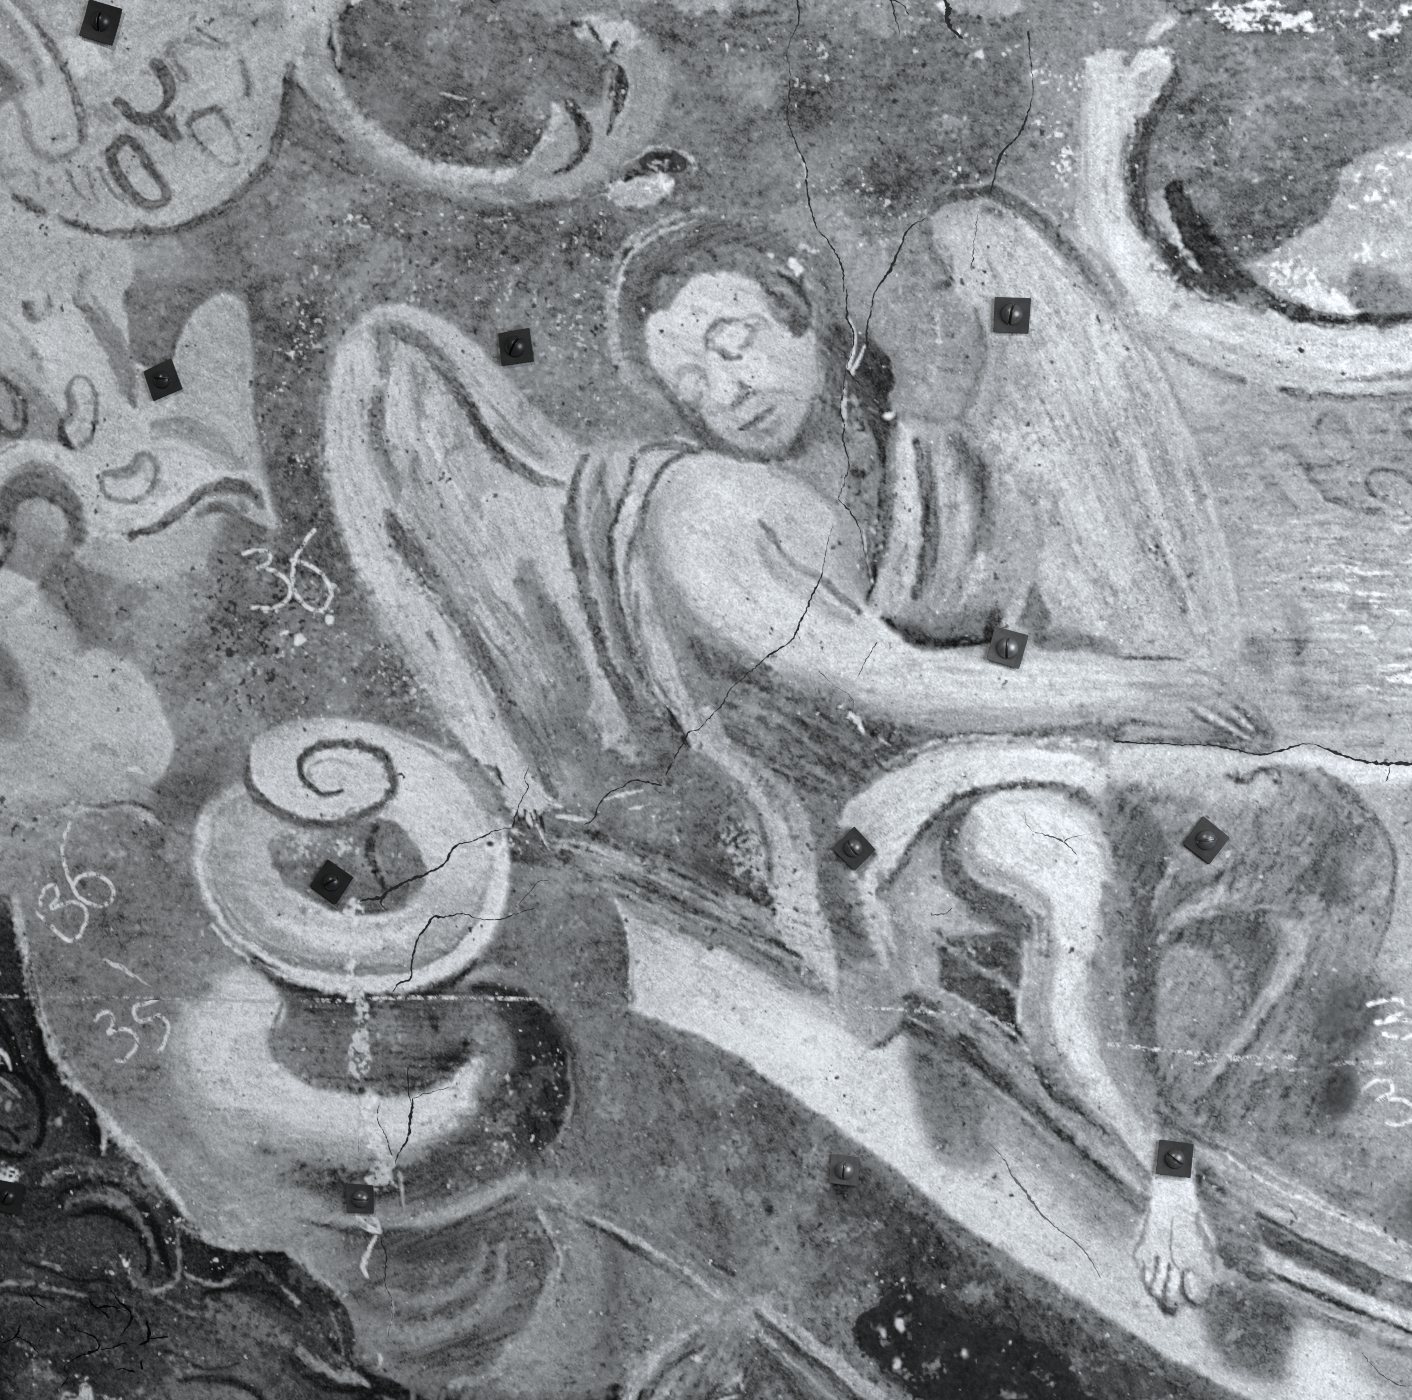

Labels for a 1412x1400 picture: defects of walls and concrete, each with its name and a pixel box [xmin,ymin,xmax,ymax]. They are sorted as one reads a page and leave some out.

crack [890,0,1034,270]
crack [584,0,925,825]
crack [1113,740,1412,781]
crack [360,767,529,910]
crack [393,879,550,992]
crack [358,1068,449,1163]